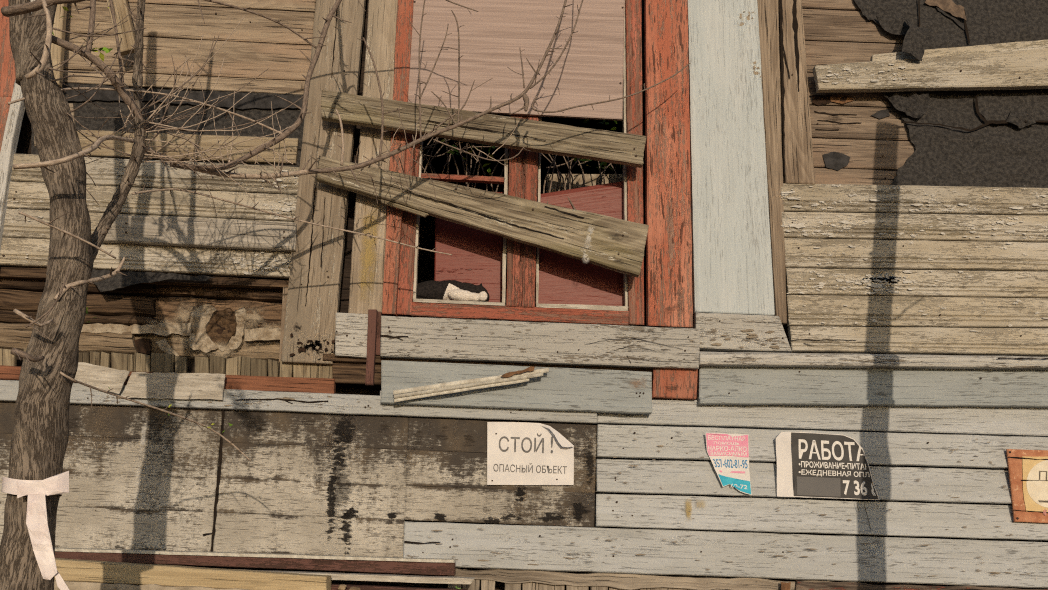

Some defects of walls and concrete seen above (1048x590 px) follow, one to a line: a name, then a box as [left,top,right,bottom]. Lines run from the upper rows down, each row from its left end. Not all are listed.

peeling [821,63,907,84]
peeling [781,184,1048,306]
flaking render [154,304,274,357]
damp [325,414,359,554]